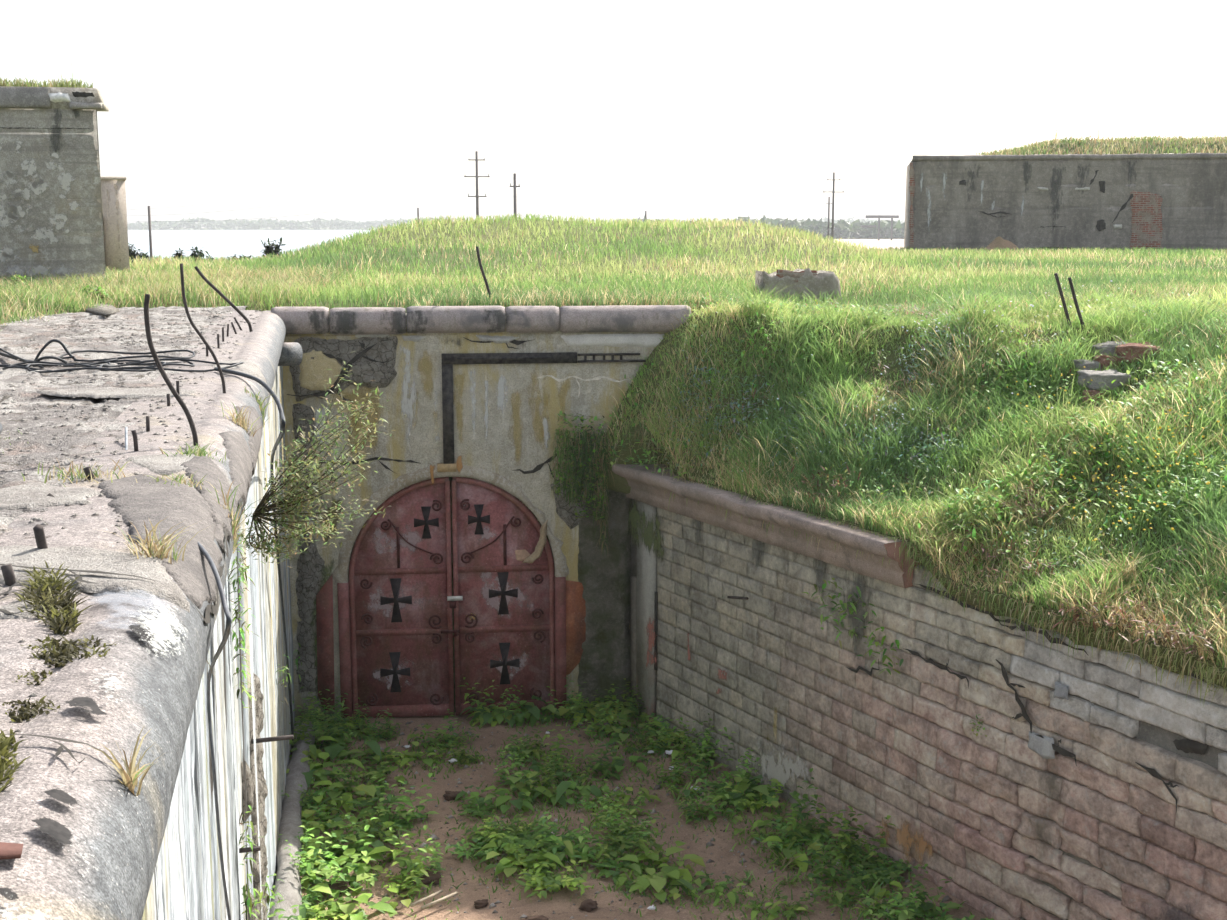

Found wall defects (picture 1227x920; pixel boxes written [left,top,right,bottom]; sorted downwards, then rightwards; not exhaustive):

water stain [1051,164,1090,228]
spalling [1096,191,1163,250]
peeling [476,335,519,344]
water stain [386,310,427,434]
crack [315,457,421,480]
water stain [309,499,342,542]
spalling [289,334,426,693]
crack [917,584,1089,656]
crack [846,649,969,688]
crack [995,659,1077,766]
spalling [1173,739,1209,755]